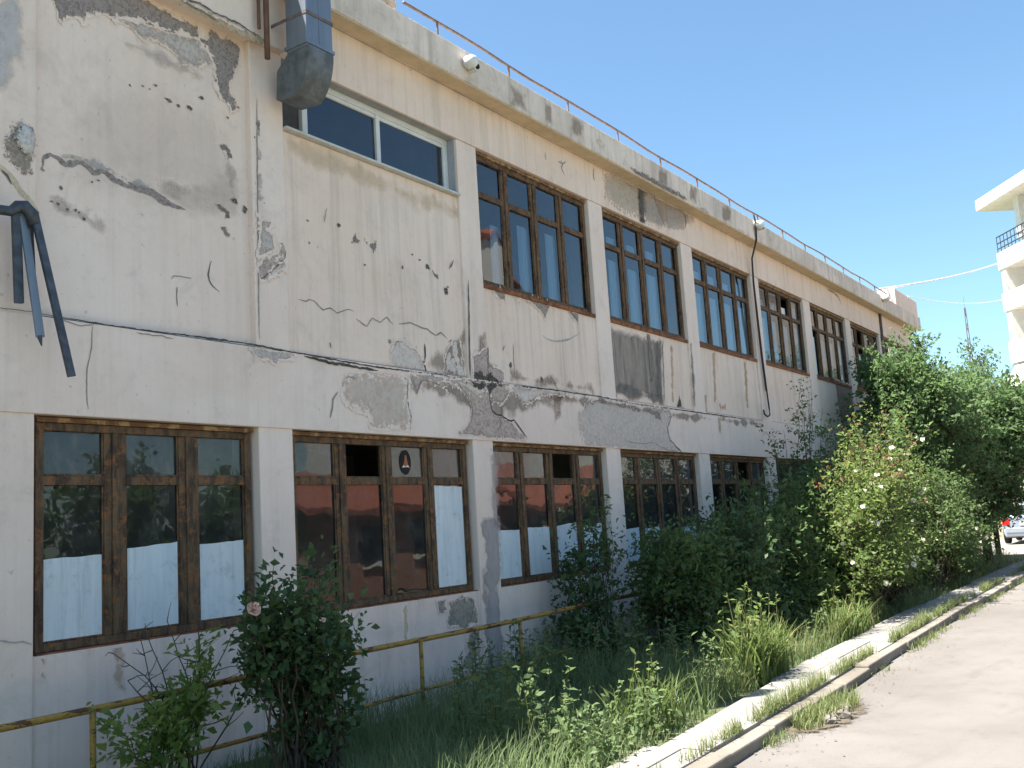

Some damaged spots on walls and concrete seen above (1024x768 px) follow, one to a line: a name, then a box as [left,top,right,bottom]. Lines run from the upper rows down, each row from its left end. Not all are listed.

peeling [53,0,264,119]
spalling [41,153,185,210]
spalling [216,173,291,283]
crack [2,118,760,421]
damp [433,334,465,369]
damp [426,383,473,409]
peeling [330,280,682,453]
damp [491,330,701,422]
flaking render [436,595,481,677]